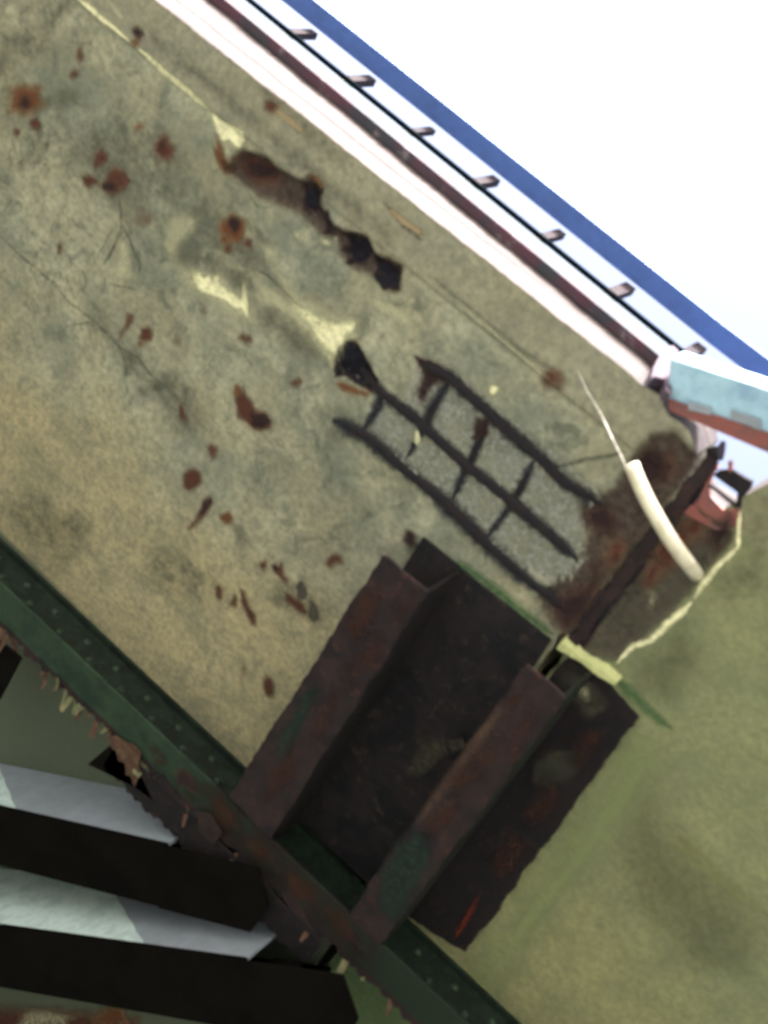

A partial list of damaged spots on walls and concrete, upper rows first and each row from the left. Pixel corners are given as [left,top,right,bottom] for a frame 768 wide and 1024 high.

corrosion [9,84,42,136]
corrosion [82,149,130,196]
corrosion [218,215,252,254]
spalling [214,148,402,292]
corrosion [234,385,271,431]
corrosion [183,469,201,490]
corrosion [189,497,232,529]
corrosion [215,586,256,625]
corrosion [259,561,306,613]
leakage [617,512,742,664]
peeling [40,670,109,739]
corrosion [263,676,274,697]